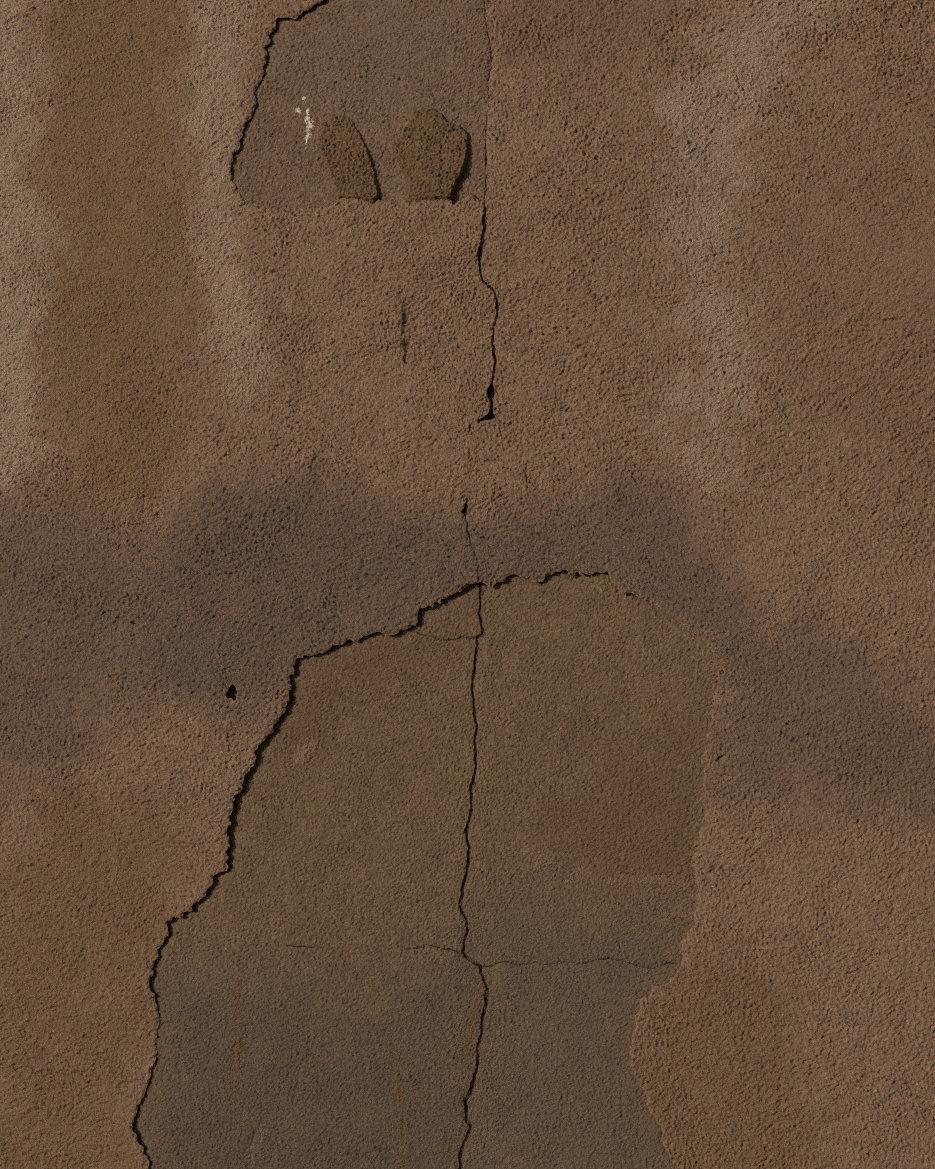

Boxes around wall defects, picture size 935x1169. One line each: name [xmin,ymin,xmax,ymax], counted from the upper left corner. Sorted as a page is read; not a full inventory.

spalling [231,0,491,217]
crack [468,2,498,432]
spalling [132,569,724,1169]
crack [414,499,676,1169]